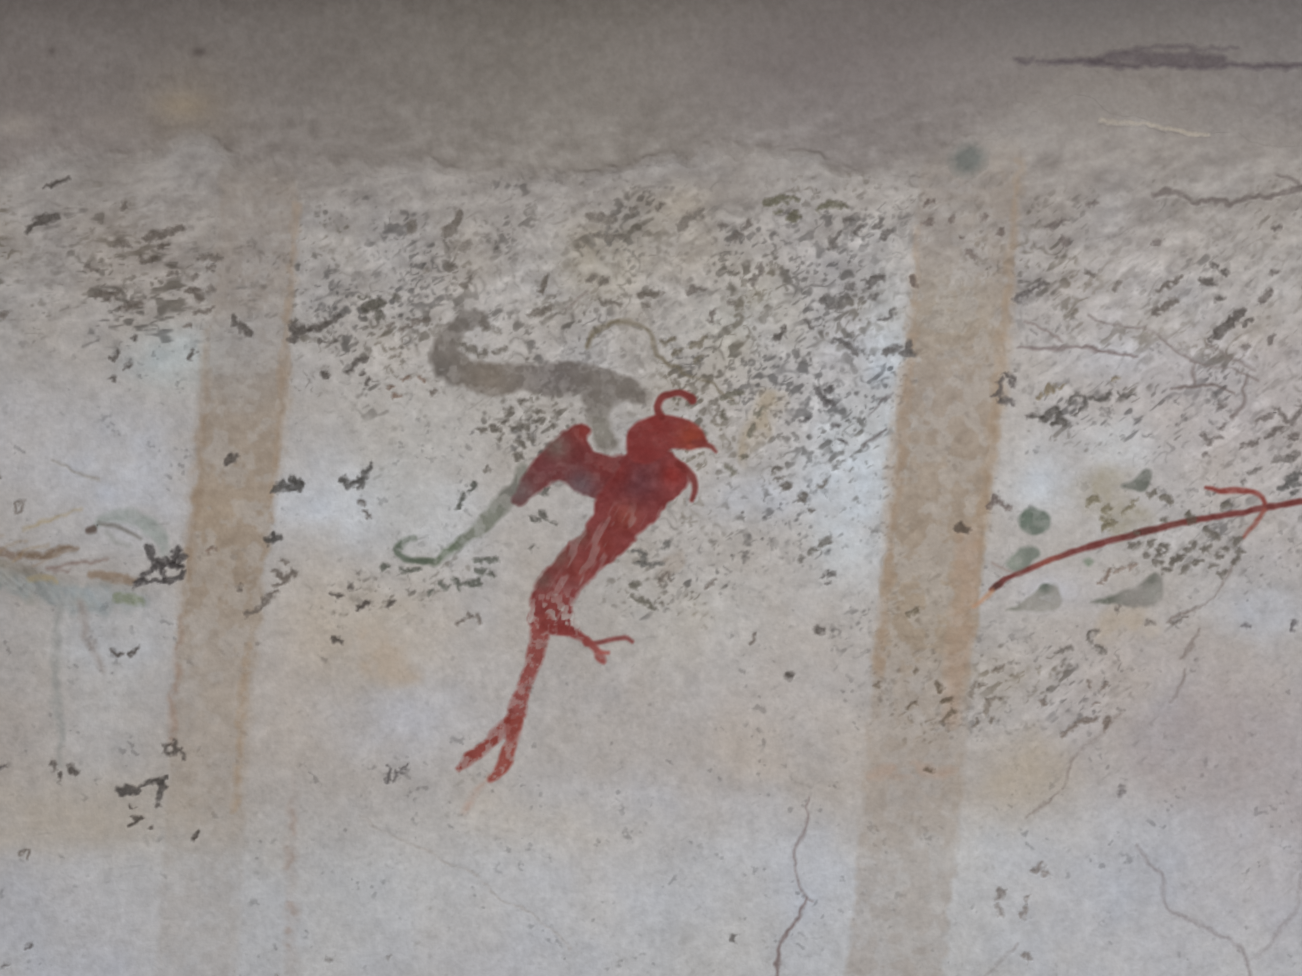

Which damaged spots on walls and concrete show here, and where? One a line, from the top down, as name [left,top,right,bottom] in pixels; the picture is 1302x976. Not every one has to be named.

spalling [584,193,895,252]
spalling [284,291,431,346]
spalling [1151,261,1282,357]
spalling [474,398,559,463]
spalling [989,371,1138,429]
spalling [1198,398,1302,500]
spalling [268,474,306,496]
spalling [336,460,374,521]
spalling [1084,488,1247,587]
spalling [426,555,501,599]
crack [772,795,814,976]
crack [1134,843,1302,976]